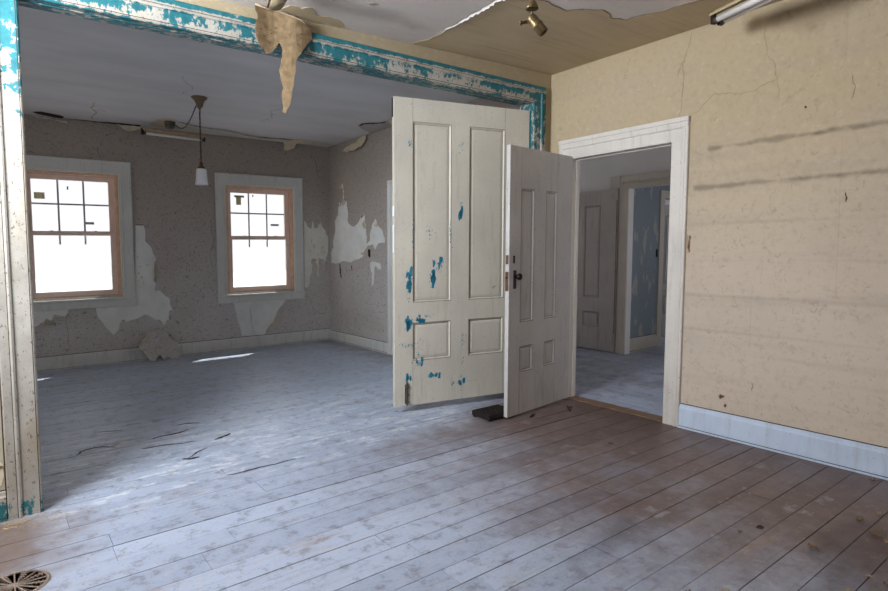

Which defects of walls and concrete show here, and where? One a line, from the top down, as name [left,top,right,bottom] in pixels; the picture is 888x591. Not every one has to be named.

peeling [255,0,344,114]
peeling [413,0,734,75]
peeling [96,225,173,335]
peeling [234,299,286,336]
peeling [304,184,385,288]